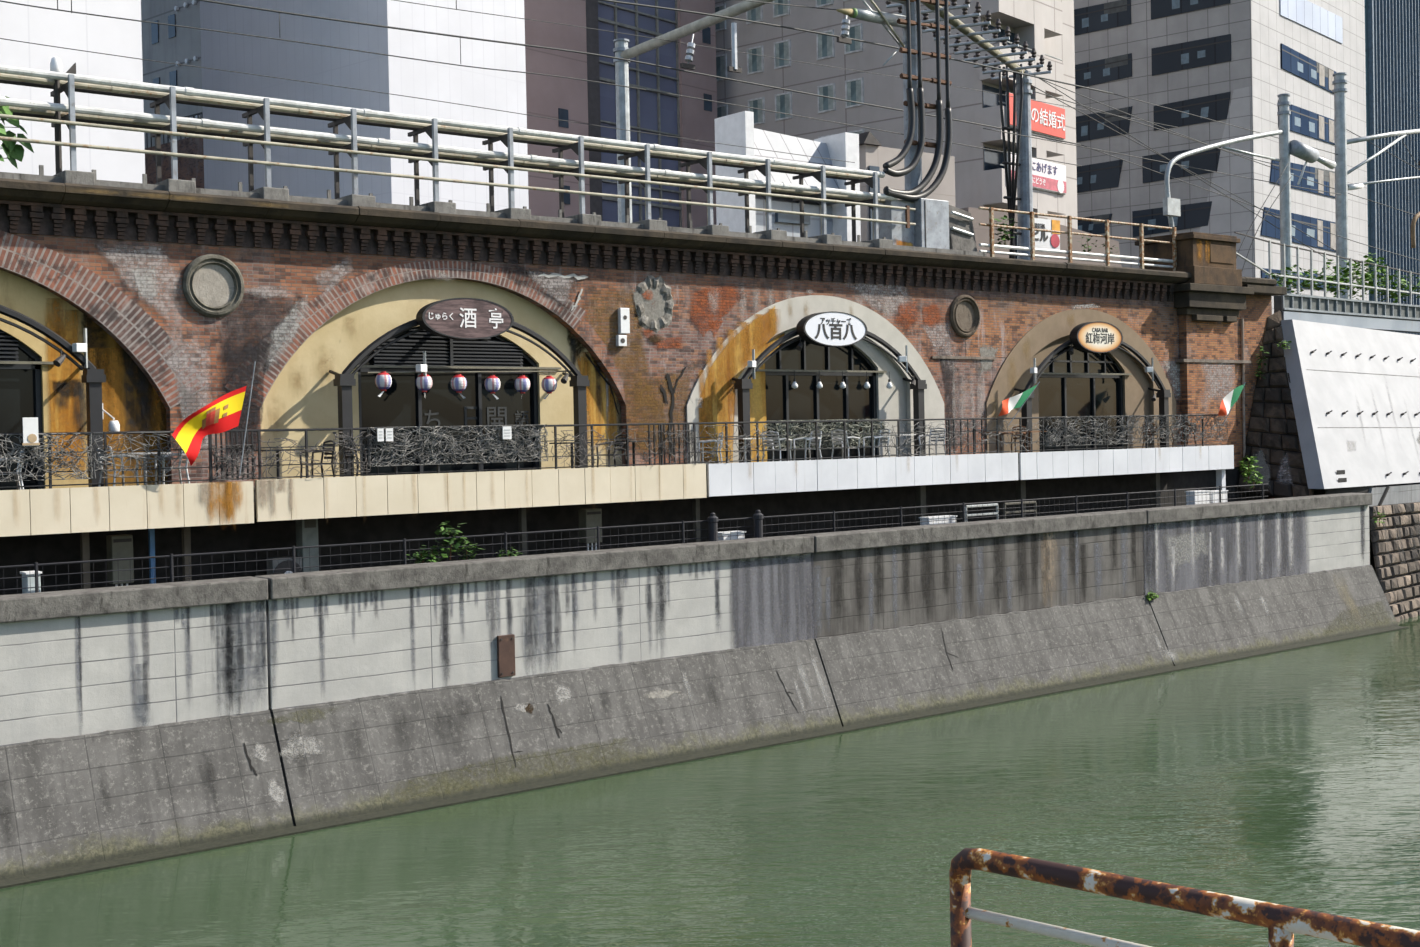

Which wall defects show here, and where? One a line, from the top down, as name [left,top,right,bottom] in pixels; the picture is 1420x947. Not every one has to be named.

rust [47,298,168,486]
rust [592,294,785,462]
rust [201,481,242,516]
rust [259,479,293,512]
leakage [130,611,149,726]
leakage [175,607,191,685]
leakage [410,569,627,663]
leakage [648,511,1307,648]
crack [501,697,523,767]